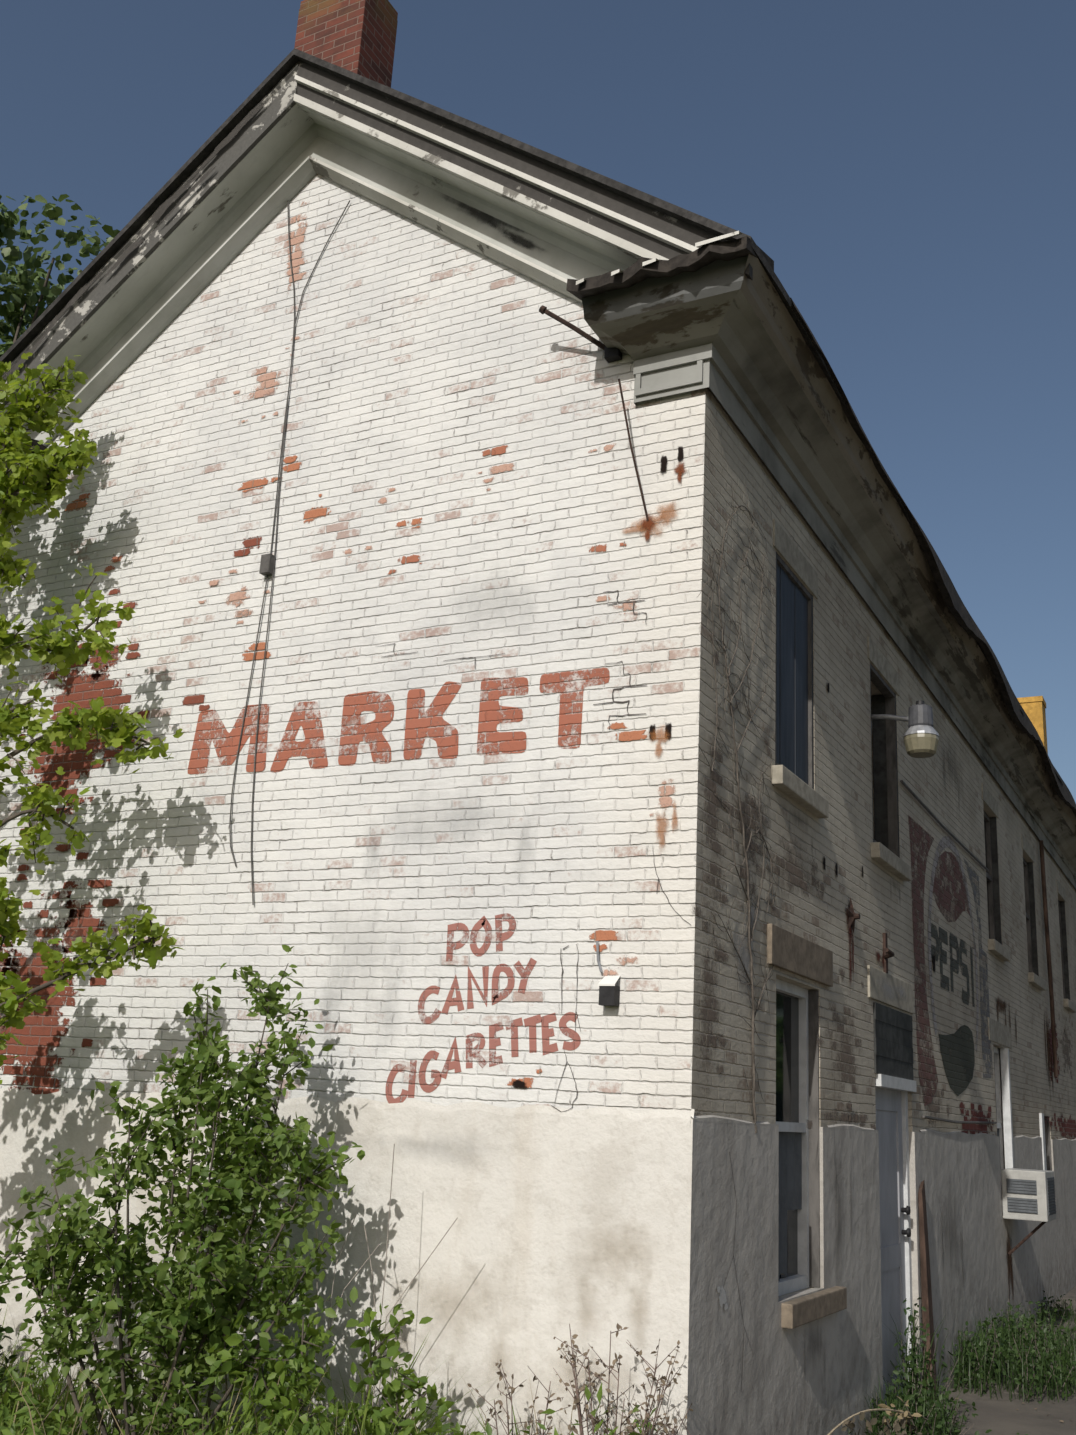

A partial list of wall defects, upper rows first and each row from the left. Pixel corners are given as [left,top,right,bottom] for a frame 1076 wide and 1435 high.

peeling [2,95,267,379]
peeling [286,202,307,290]
peeling [233,367,280,398]
peeling [238,455,302,492]
peeling [303,494,331,523]
peeling [396,517,422,528]
rust [625,504,674,541]
peeling [388,554,424,574]
peeling [28,641,149,817]
peeling [55,844,89,860]
peeling [17,864,29,881]
peeling [0,879,119,1095]